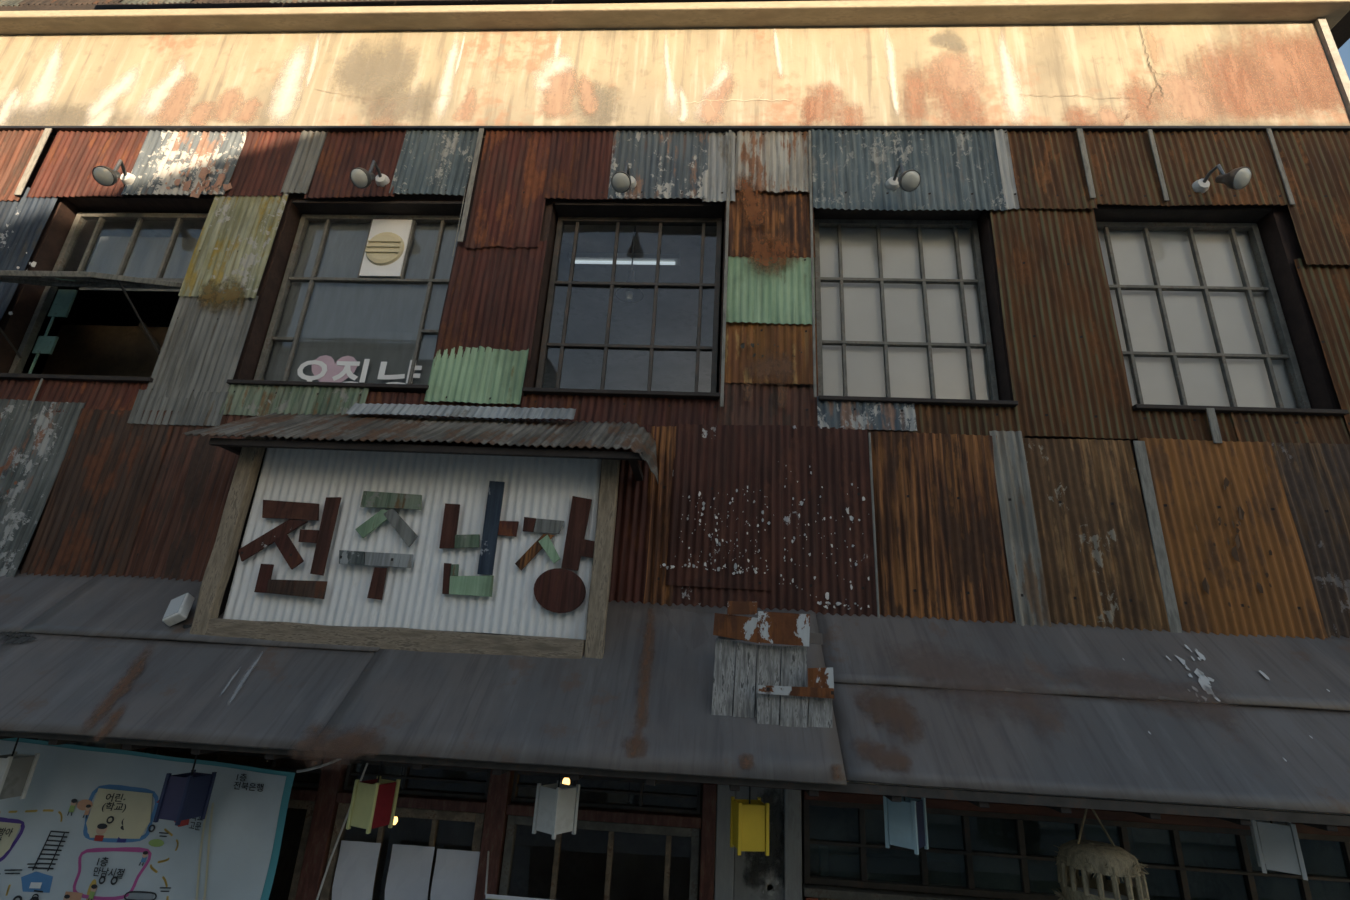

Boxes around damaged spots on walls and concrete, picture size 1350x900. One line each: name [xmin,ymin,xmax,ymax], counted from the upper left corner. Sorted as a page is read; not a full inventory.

corrosion [378,110,393,126]
corrosion [542,71,598,117]
corrosion [804,84,863,126]
crack [1020,23,1165,110]
corrosion [739,176,798,272]
peeling [660,466,870,610]
peeling [1166,644,1220,703]